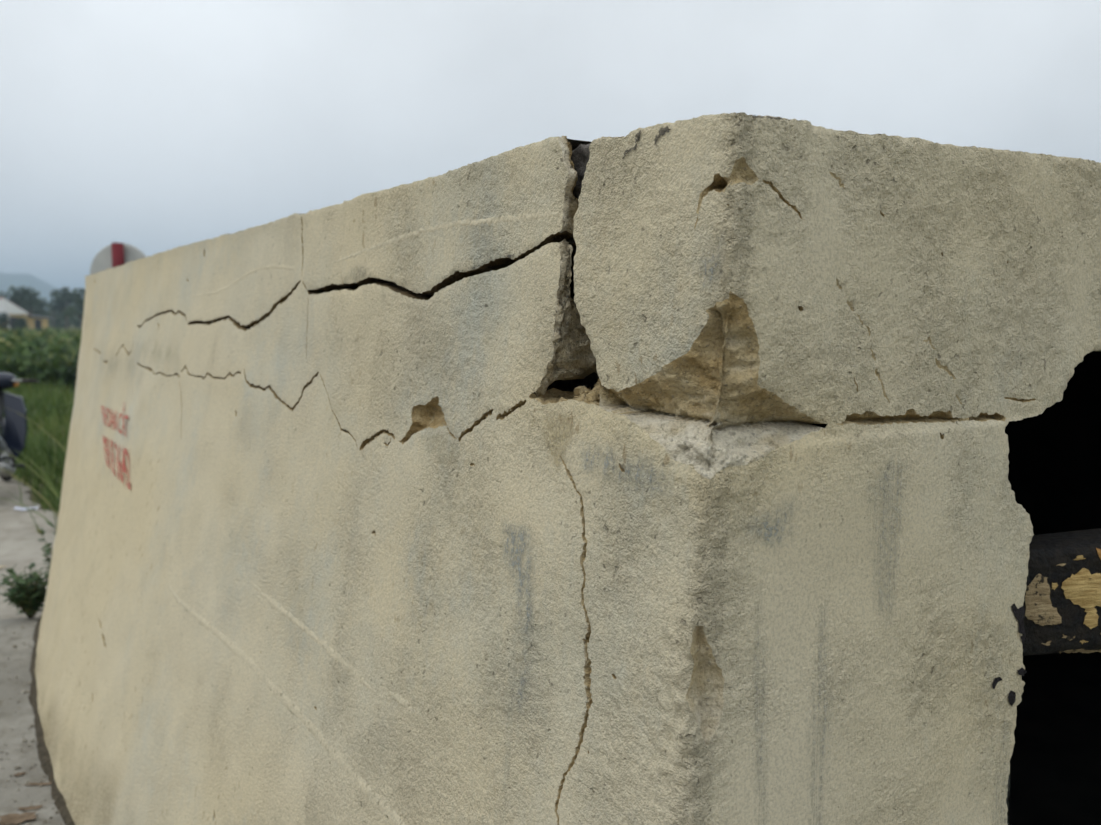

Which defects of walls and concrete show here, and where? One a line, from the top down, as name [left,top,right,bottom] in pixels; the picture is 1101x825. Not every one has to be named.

crack [763,180,802,219]
crack [94,136,599,451]
spalling [399,396,447,445]
spalling [599,291,825,479]
crack [544,431,593,825]
spalling [686,626,724,747]
peeling [1011,555,1101,653]